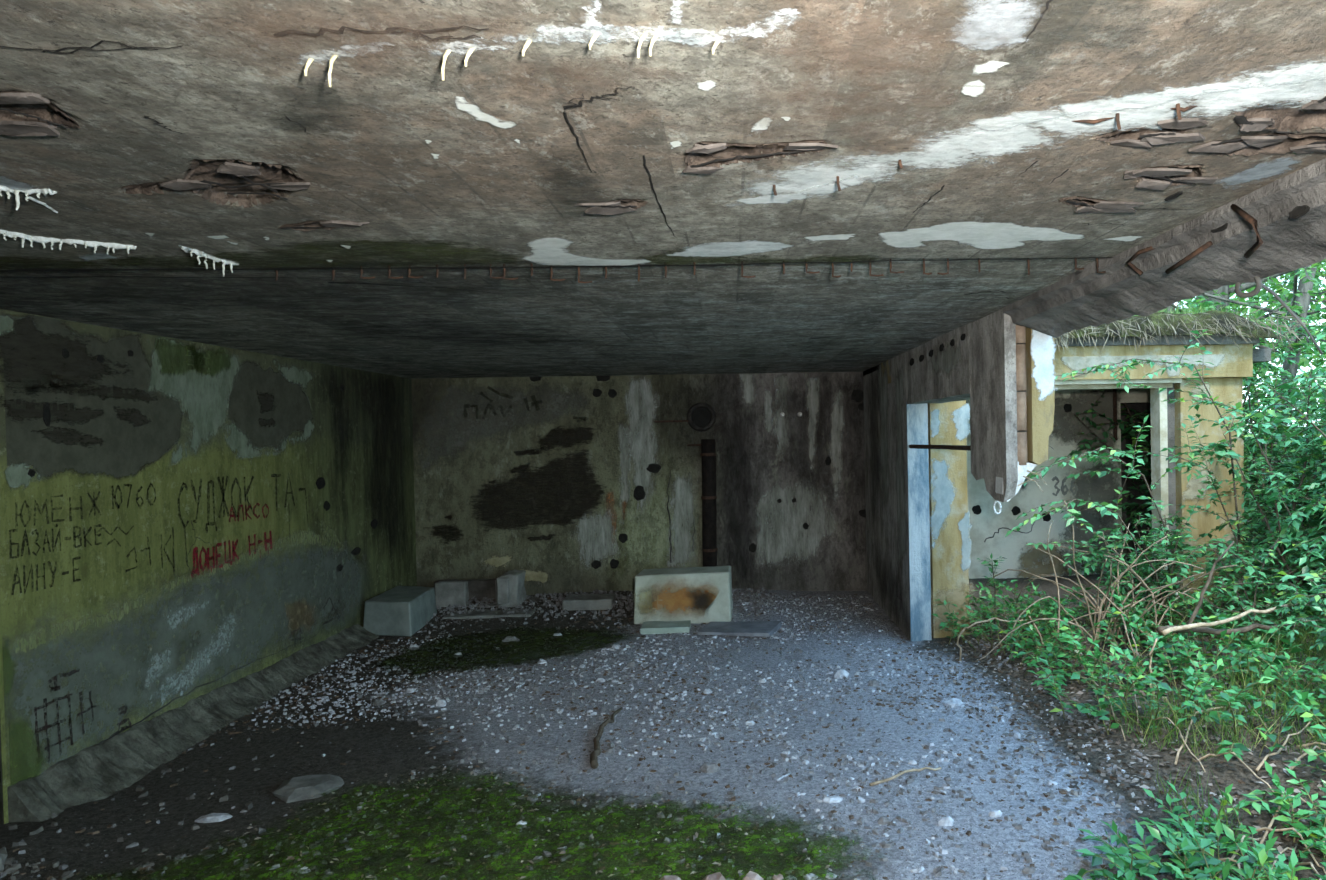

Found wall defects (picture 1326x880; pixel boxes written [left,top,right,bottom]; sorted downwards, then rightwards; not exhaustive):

crack [0,40,183,54]
crack [273,25,489,41]
leakage [434,1,799,55]
spalling [0,90,80,136]
spalling [683,140,838,175]
leakage [727,61,1326,206]
spalling [1059,96,1326,213]
leakage [0,176,58,213]
spalling [122,159,310,208]
leakage [0,229,154,261]
leakage [668,234,855,257]
peeling [0,315,182,489]